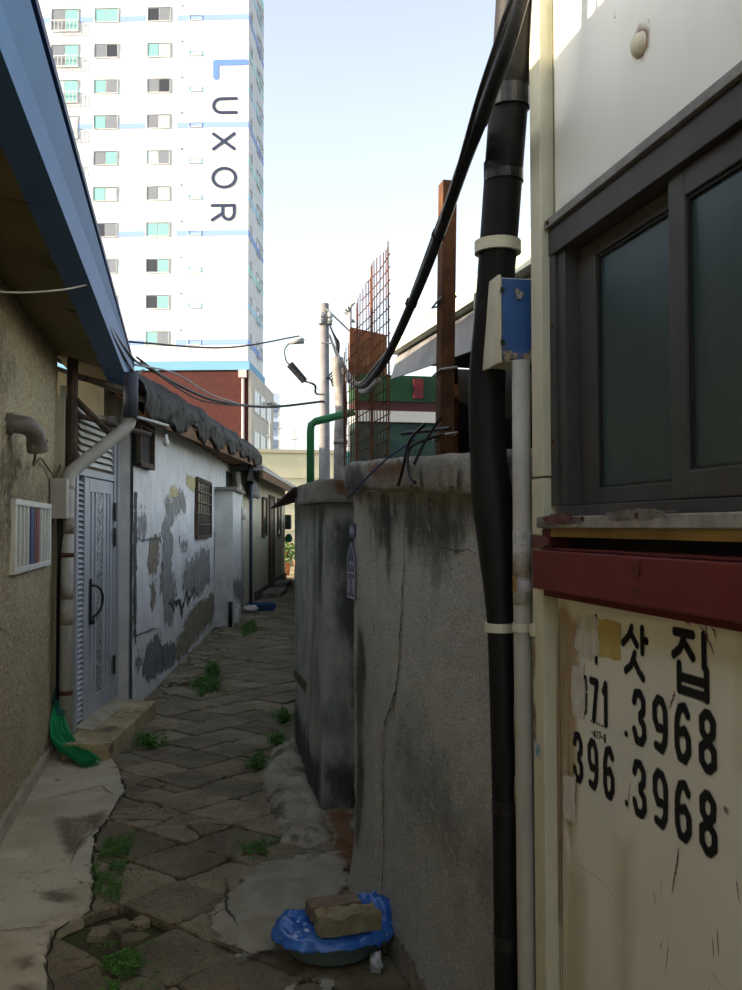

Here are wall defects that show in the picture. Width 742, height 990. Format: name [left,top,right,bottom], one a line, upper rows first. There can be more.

peeling [132,475,215,685]
damp [294,521,365,841]
crack [382,525,405,882]
damp [374,496,464,570]